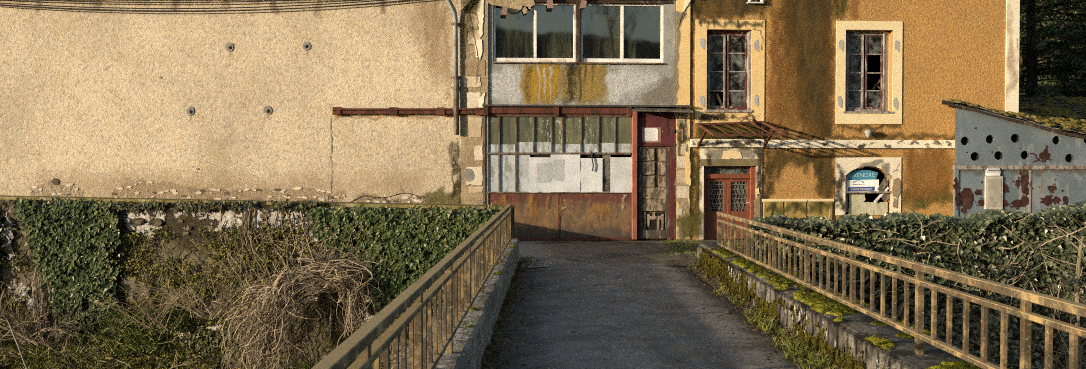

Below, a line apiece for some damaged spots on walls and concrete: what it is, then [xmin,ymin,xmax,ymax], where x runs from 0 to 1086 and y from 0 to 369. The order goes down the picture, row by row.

water stain [503,64,606,102]
water stain [666,0,858,224]
peeling [803,139,951,149]
rust [953,177,985,214]
water stain [122,199,340,248]